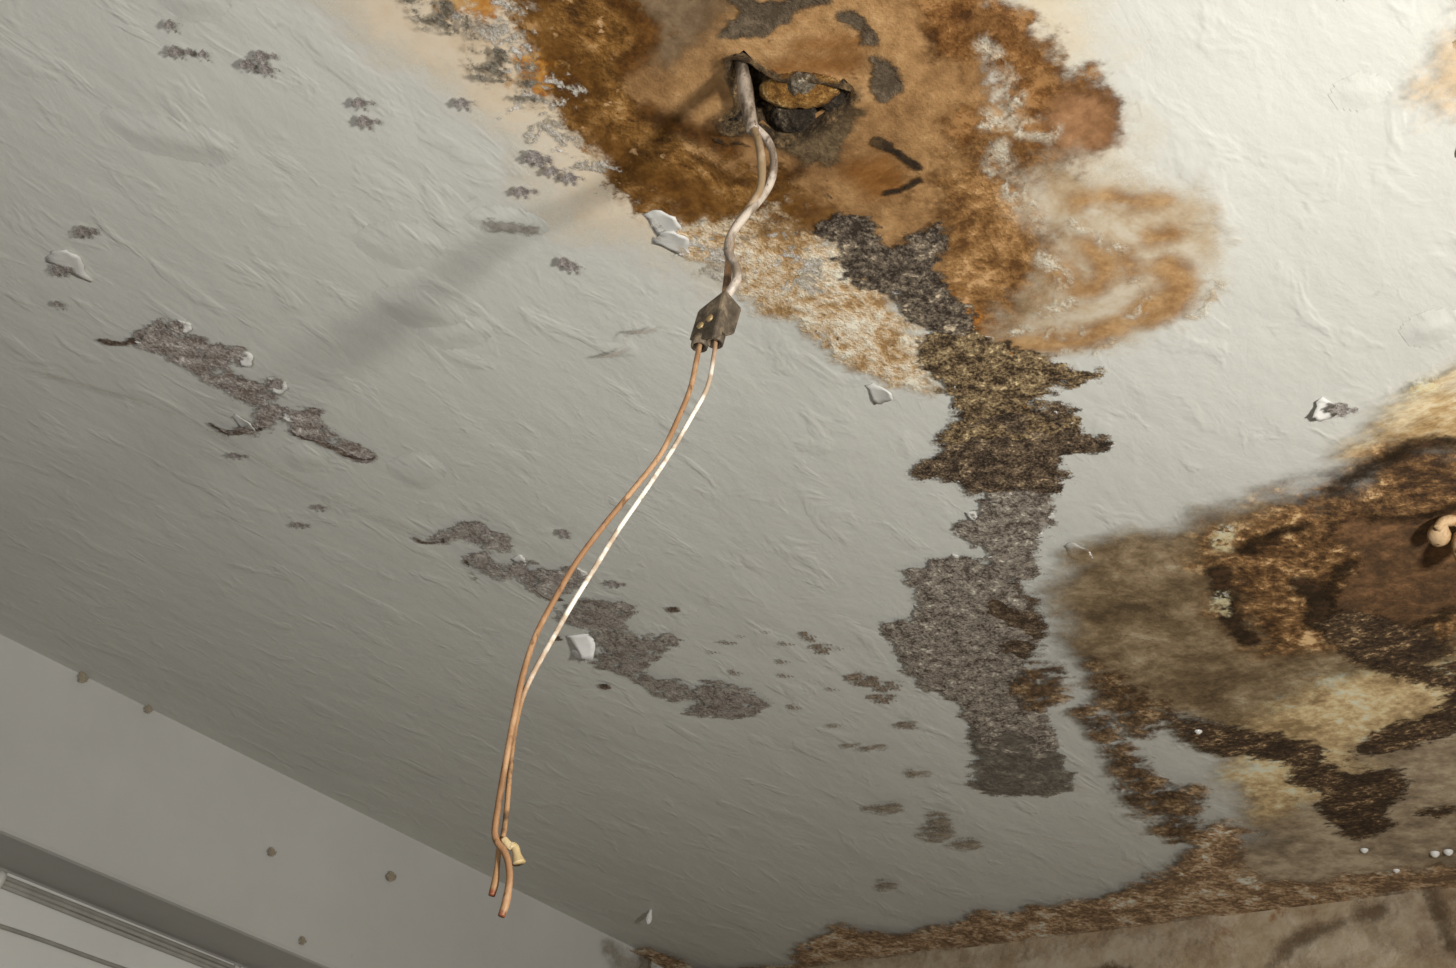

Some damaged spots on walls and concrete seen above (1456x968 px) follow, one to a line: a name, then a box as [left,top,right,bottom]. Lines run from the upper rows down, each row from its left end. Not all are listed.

leakage [450,0,622,173]
leakage [651,221,829,294]
corrosion [343,0,1217,396]
leakage [979,73,1060,227]
leakage [1011,252,1077,337]
peeling [97,318,377,464]
spalling [814,211,1115,798]
peeling [413,521,771,720]
leakage [745,370,1456,968]
peeling [863,803,902,815]
peeling [917,811,982,850]
leakage [604,941,694,968]